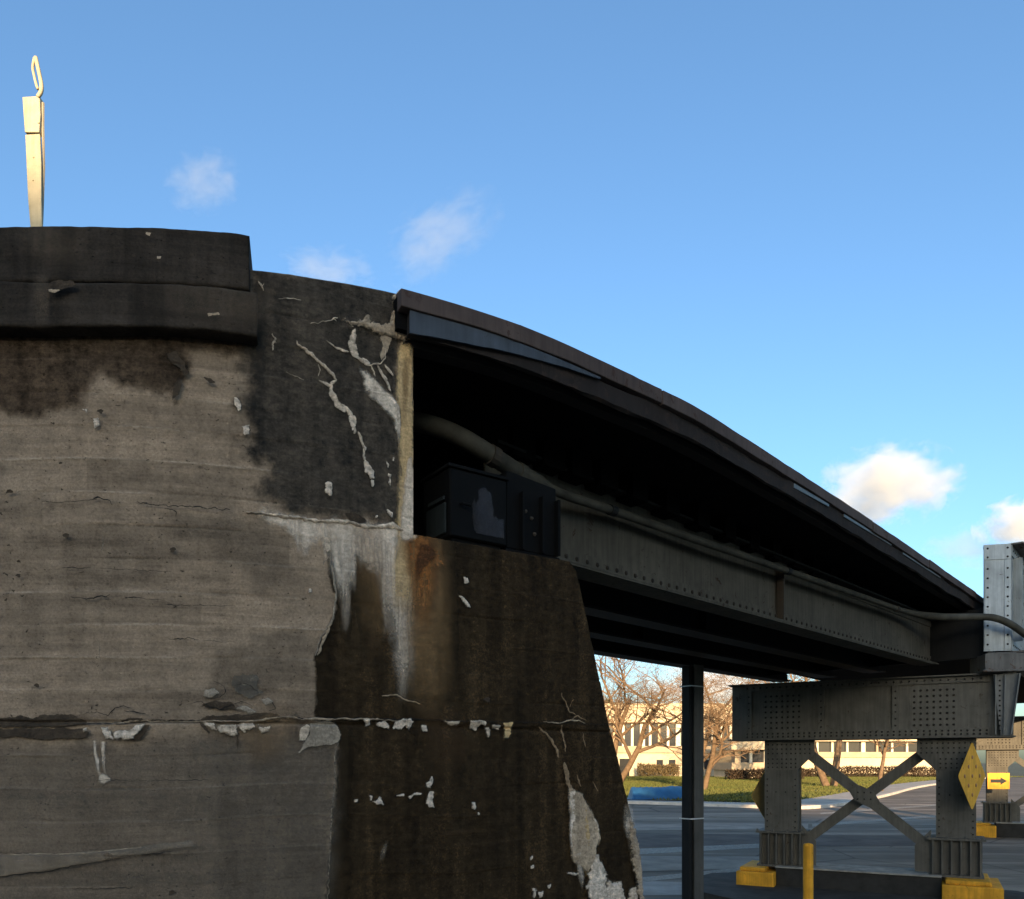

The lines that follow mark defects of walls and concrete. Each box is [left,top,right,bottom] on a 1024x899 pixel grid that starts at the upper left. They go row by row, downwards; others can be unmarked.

crack [272,317,393,456]
water stain [0,270,640,899]
crack [315,557,337,656]
rust [396,535,444,667]
peeling [298,721,341,753]
crack [85,694,609,899]